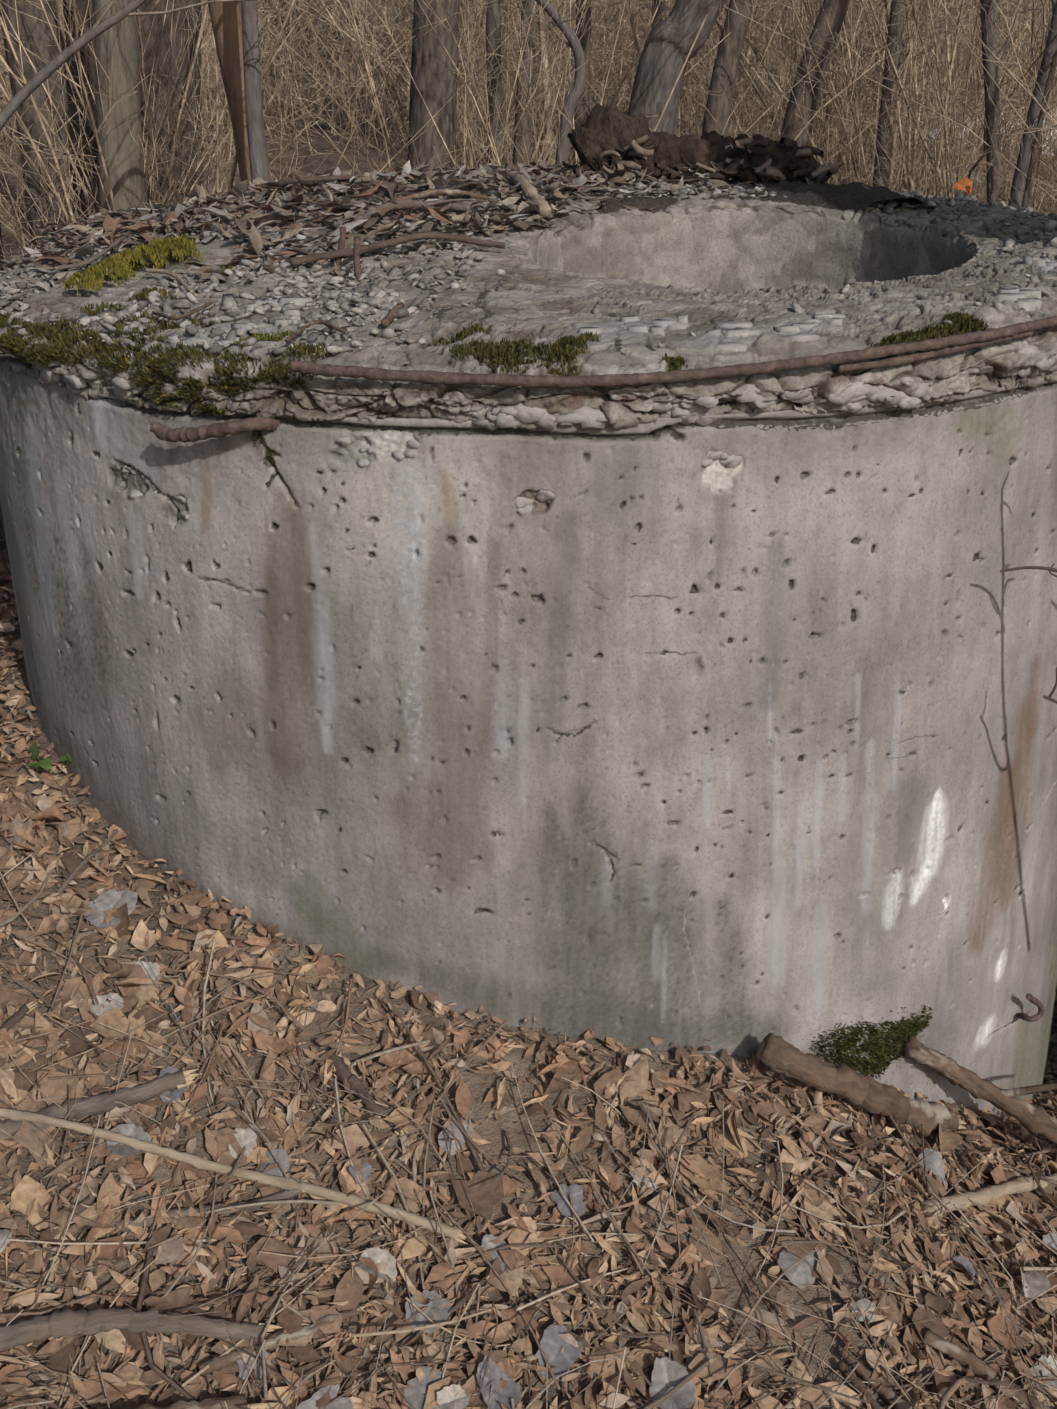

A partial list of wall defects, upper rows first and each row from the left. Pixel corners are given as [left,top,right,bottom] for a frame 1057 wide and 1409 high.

rust [811,369,883,393]
spalling [107,467,148,504]
spalling [702,450,744,508]
spalling [163,496,190,523]
spalling [690,568,757,593]
leakage [912,790,944,904]